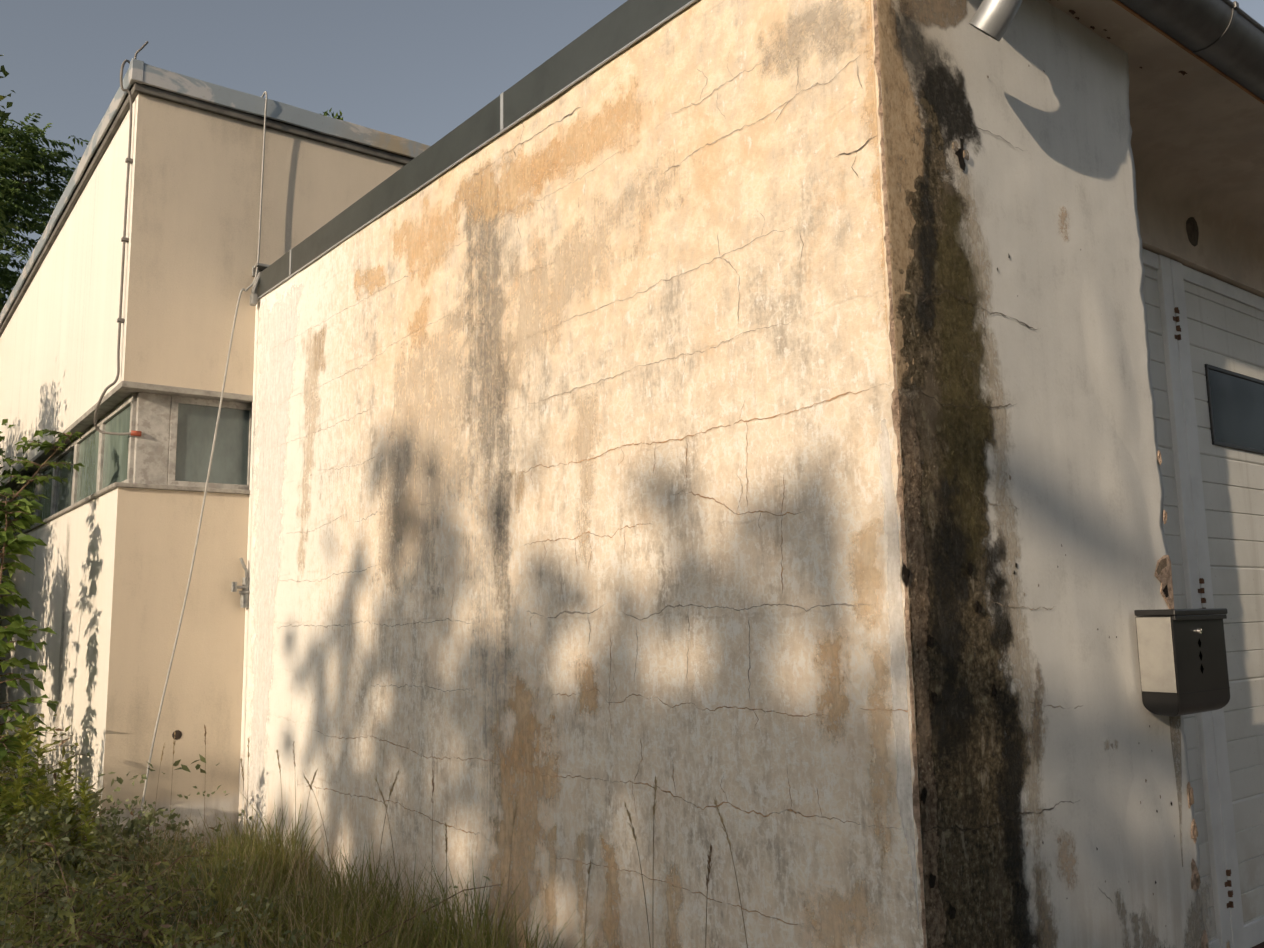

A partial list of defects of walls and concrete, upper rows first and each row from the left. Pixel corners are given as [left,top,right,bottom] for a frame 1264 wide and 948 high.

peeling [900,0,967,28]
crack [471,107,579,177]
crack [667,55,862,171]
crack [836,136,876,176]
water stain [891,10,980,335]
crack [502,213,804,401]
crack [318,389,869,824]
water stain [930,477,975,761]
water stain [957,174,1057,948]
spalling [1154,555,1174,609]
peeling [1116,892,1165,948]
peeling [1185,782,1209,948]